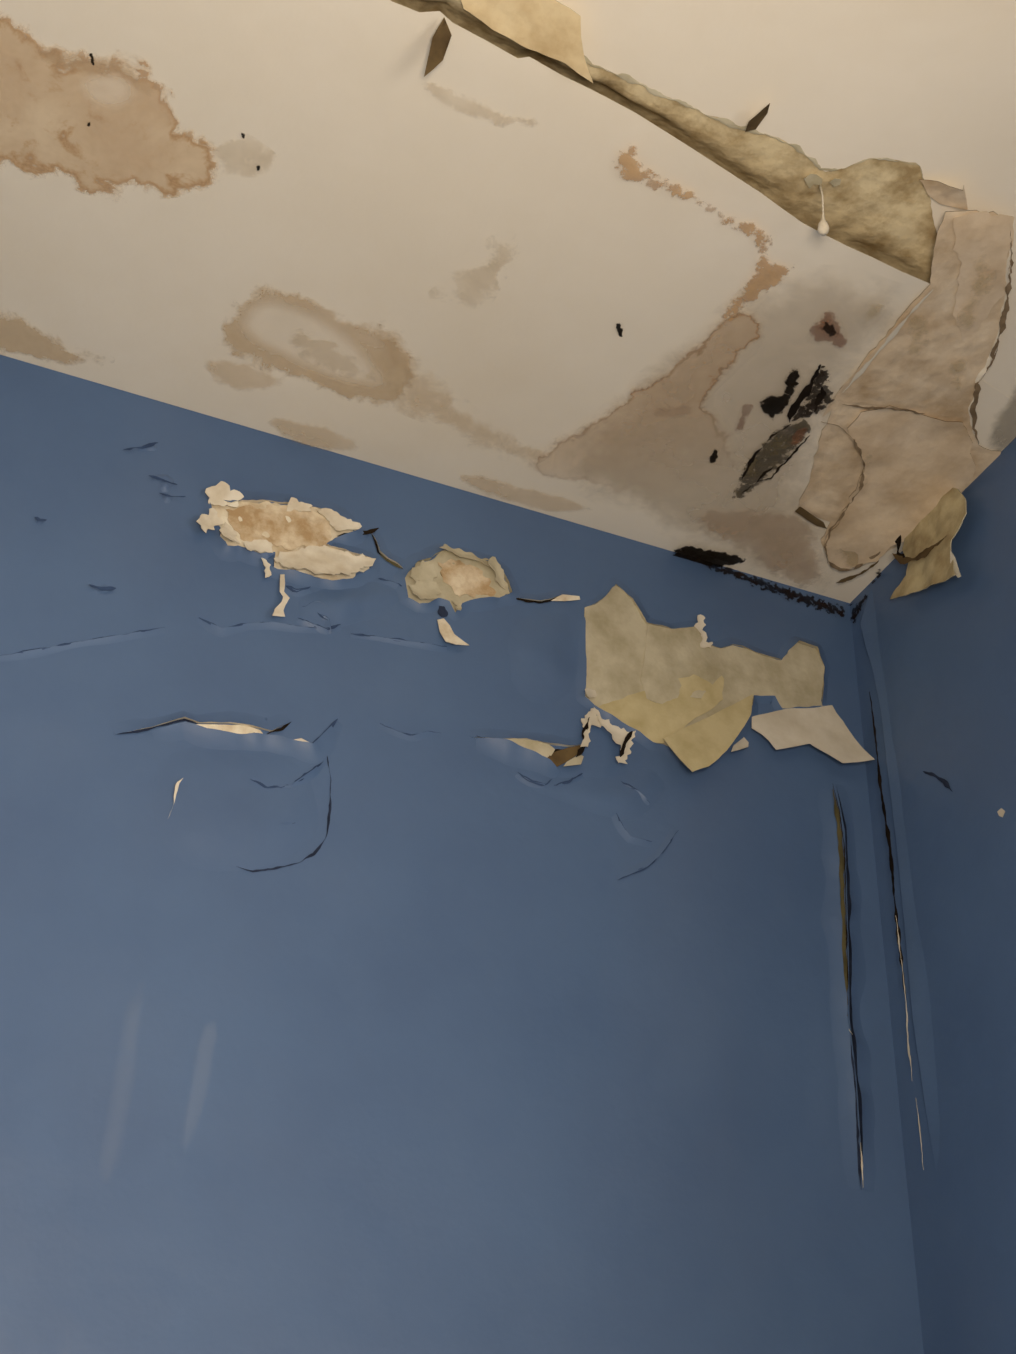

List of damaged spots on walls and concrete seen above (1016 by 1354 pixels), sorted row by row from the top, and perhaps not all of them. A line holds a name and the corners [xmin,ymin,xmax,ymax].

water stain [0,18,215,198]
peeling [424,18,452,77]
water stain [615,146,699,203]
peeling [745,103,770,132]
water stain [600,219,789,420]
water stain [732,365,834,498]
water stain [814,312,846,347]
peeling [795,179,1014,600]
peeling [196,481,521,645]
water stain [673,546,881,623]
peeling [576,577,940,1171]
crack [818,784,876,1192]